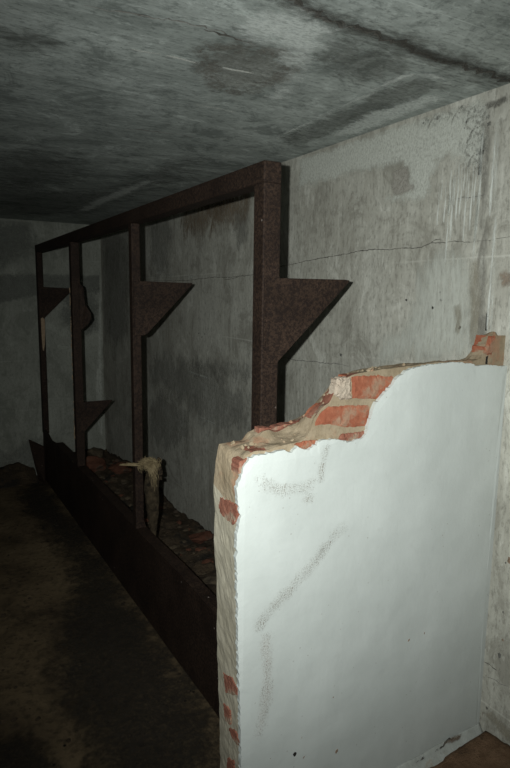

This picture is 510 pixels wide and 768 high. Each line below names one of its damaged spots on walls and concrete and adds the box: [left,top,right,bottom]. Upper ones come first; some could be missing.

water stain [236,10,331,103]
crack [280,236,510,267]